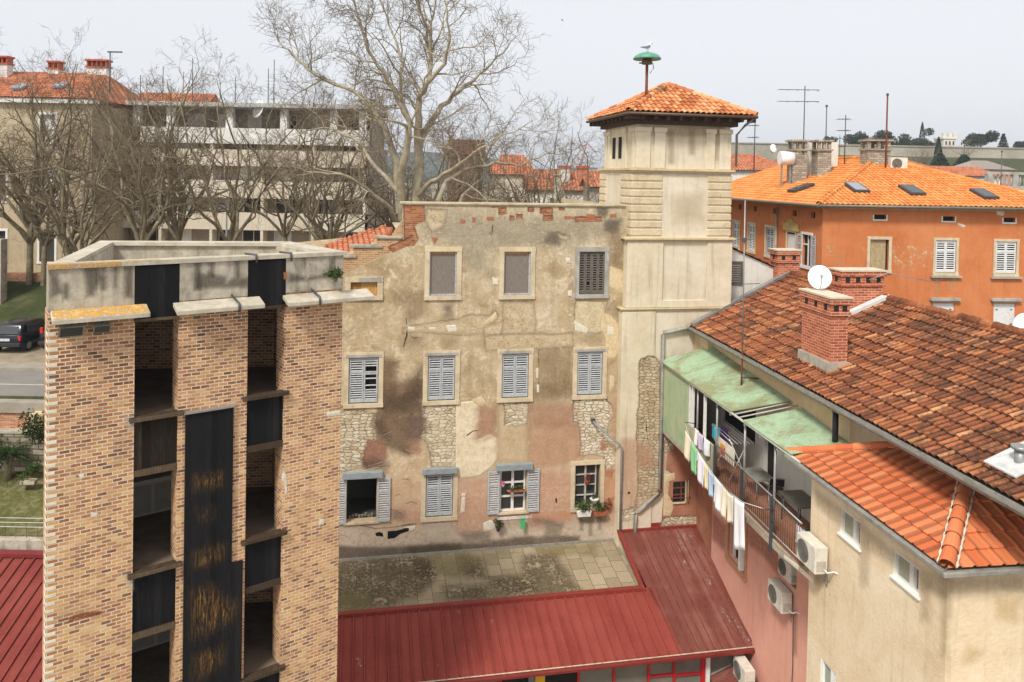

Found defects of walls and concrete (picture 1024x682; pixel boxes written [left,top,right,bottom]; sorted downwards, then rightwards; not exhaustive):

flaking render [388,205,425,252]
flaking render [461,206,616,223]
spalling [326,406,386,473]
water stain [377,361,424,451]
spalling [375,356,697,539]